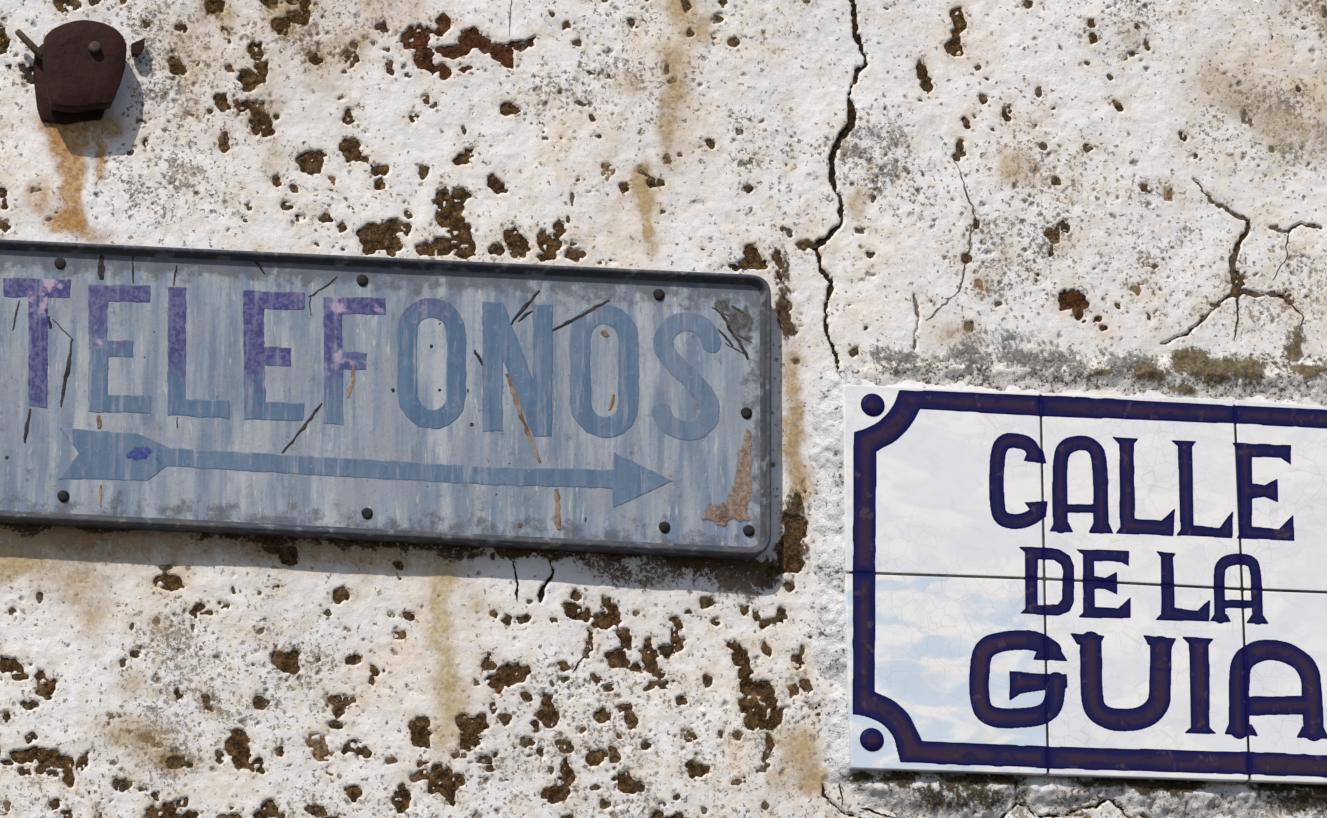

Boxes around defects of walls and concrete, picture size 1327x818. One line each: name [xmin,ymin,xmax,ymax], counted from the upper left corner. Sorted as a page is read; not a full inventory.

spalling [341,13,536,80]
rust [36,113,120,232]
spalling [272,95,612,265]
crack [812,0,868,378]
crack [1160,180,1304,345]
spalling [0,657,57,722]
spalling [112,778,199,818]
spalling [215,729,284,774]
spalling [271,648,300,675]
spalling [305,695,398,776]
spalling [387,590,720,818]
spalling [718,605,821,786]